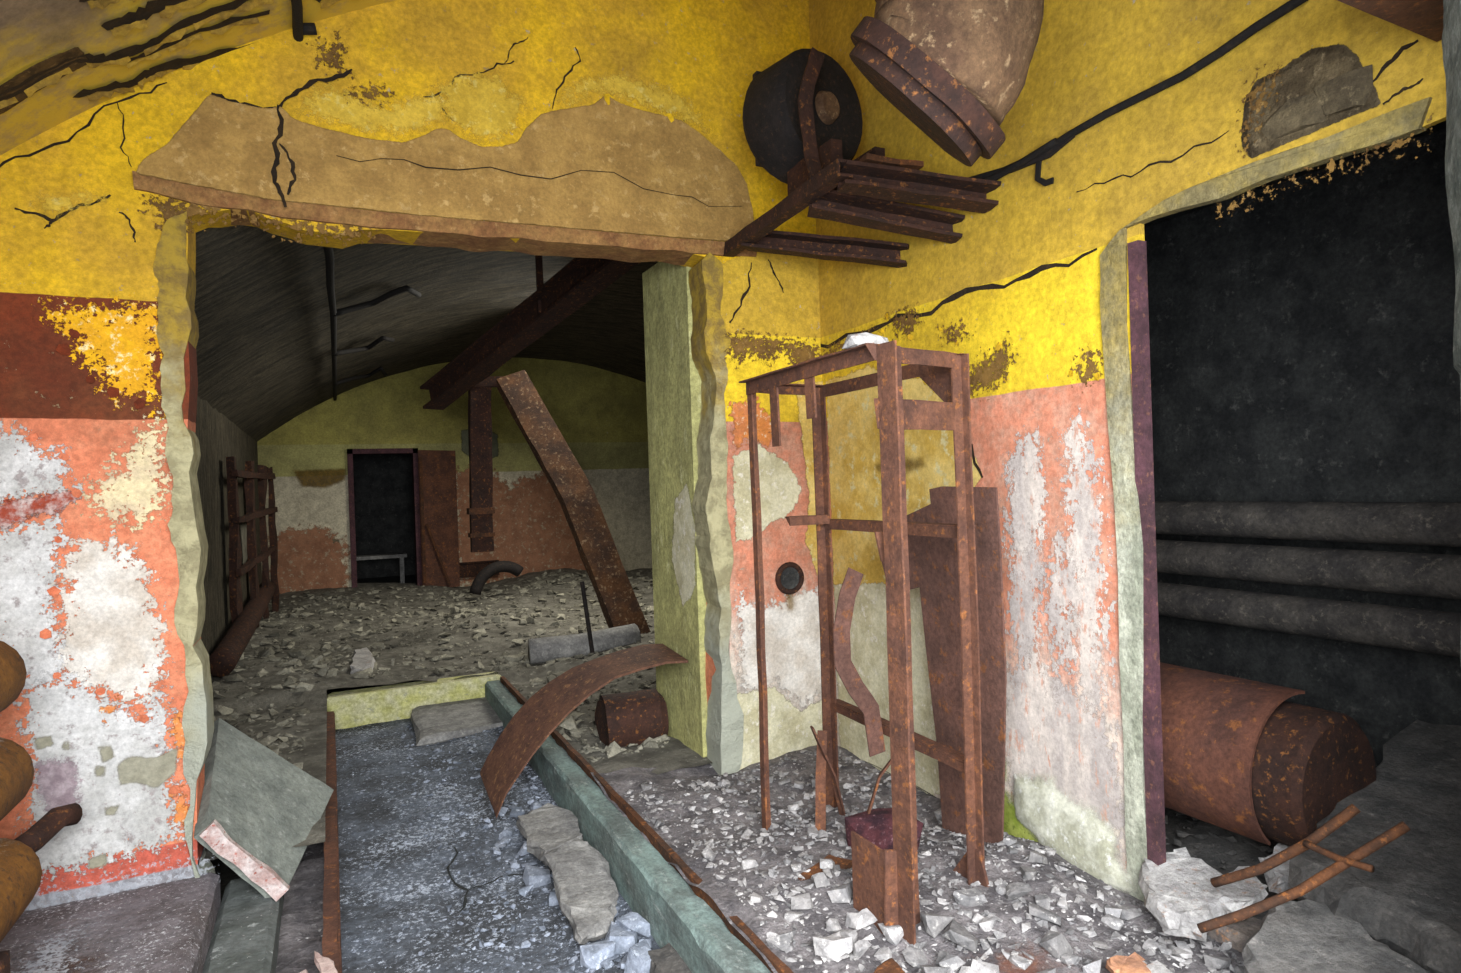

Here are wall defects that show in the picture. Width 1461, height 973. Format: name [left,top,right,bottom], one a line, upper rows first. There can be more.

peeling [30,190,106,212]
crack [15,194,136,242]
crack [0,82,167,167]
crack [211,69,352,207]
flaking render [132,28,757,265]
crack [1076,131,1228,193]
flaking render [1235,43,1381,158]
crack [1373,39,1423,105]
crack [821,248,1097,348]
peeling [0,292,290,901]
peeling [724,298,1021,796]
peeling [999,346,1127,870]